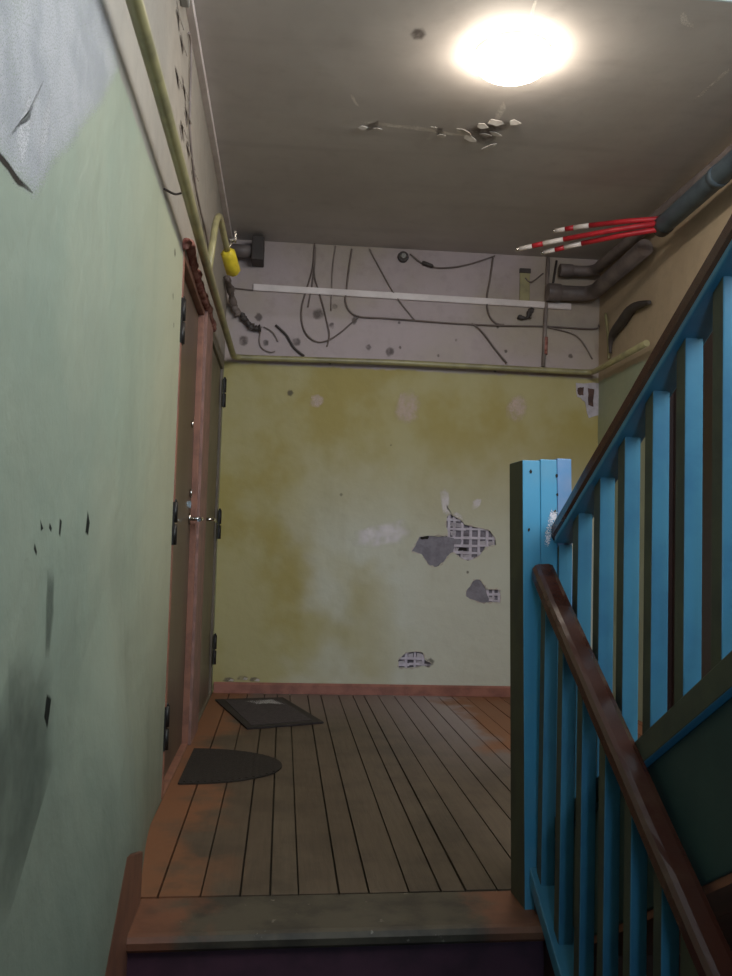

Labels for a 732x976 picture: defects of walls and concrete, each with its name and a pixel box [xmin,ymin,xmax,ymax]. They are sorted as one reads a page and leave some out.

spalling [457,119,521,150]
spalling [412,514,496,567]
spalling [466,579,501,604]
spalling [397,651,433,669]